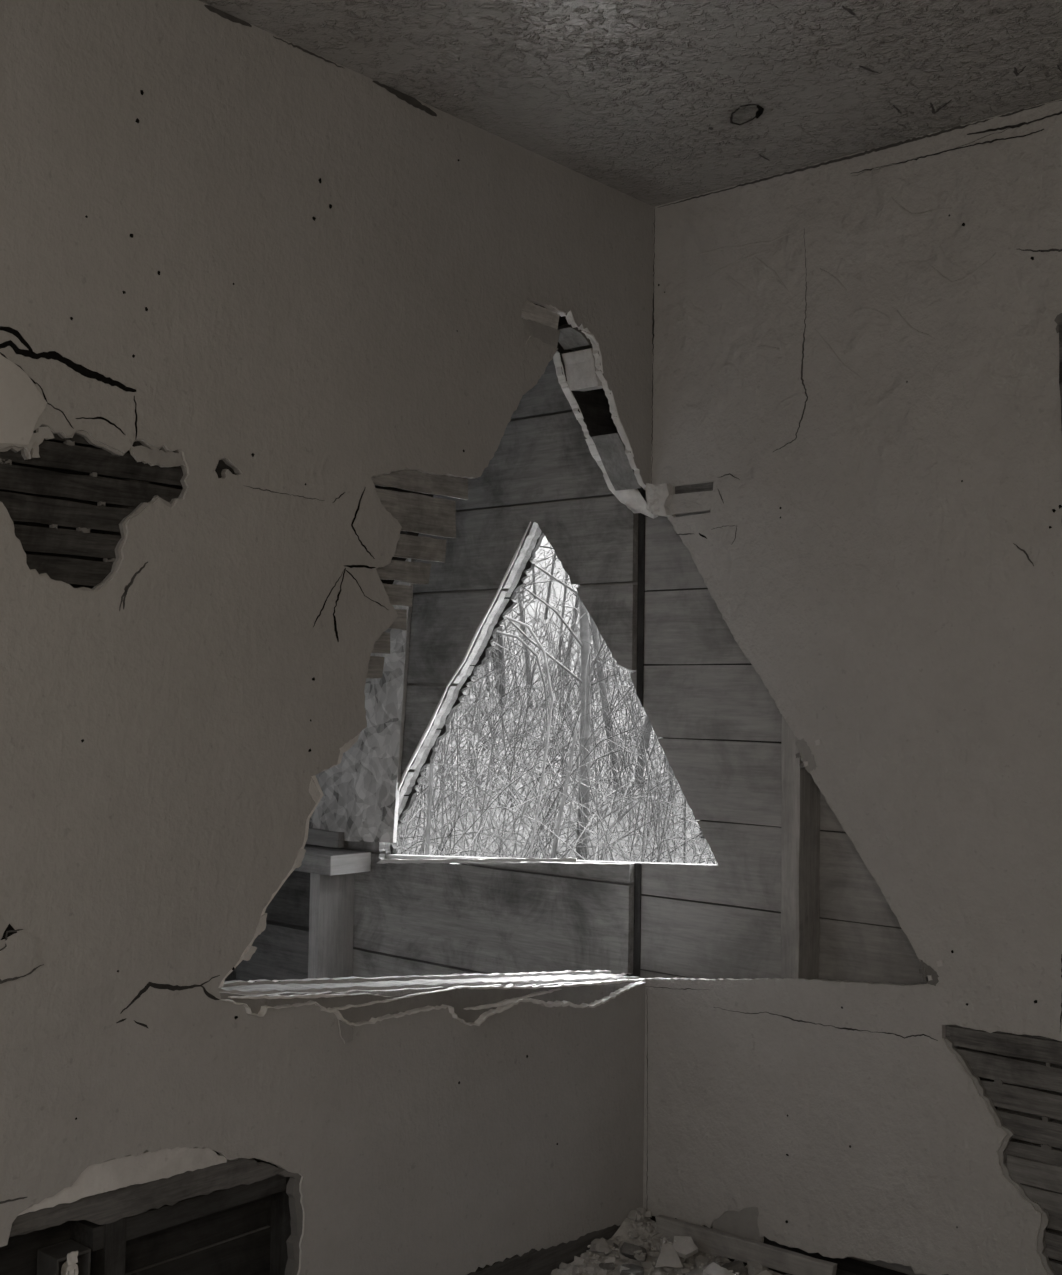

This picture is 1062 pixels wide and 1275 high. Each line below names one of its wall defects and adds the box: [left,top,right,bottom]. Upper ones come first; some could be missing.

crack [651,100,1062,484]
crack [0,326,137,440]
flaking render [0,425,187,591]
crack [247,486,388,642]
flaking render [367,469,468,678]
flaking render [675,473,740,504]
flaking render [218,733,360,988]
crack [117,975,220,1028]
flaking render [919,959,943,986]
crack [645,986,938,1200]
spalling [274,1167,303,1275]